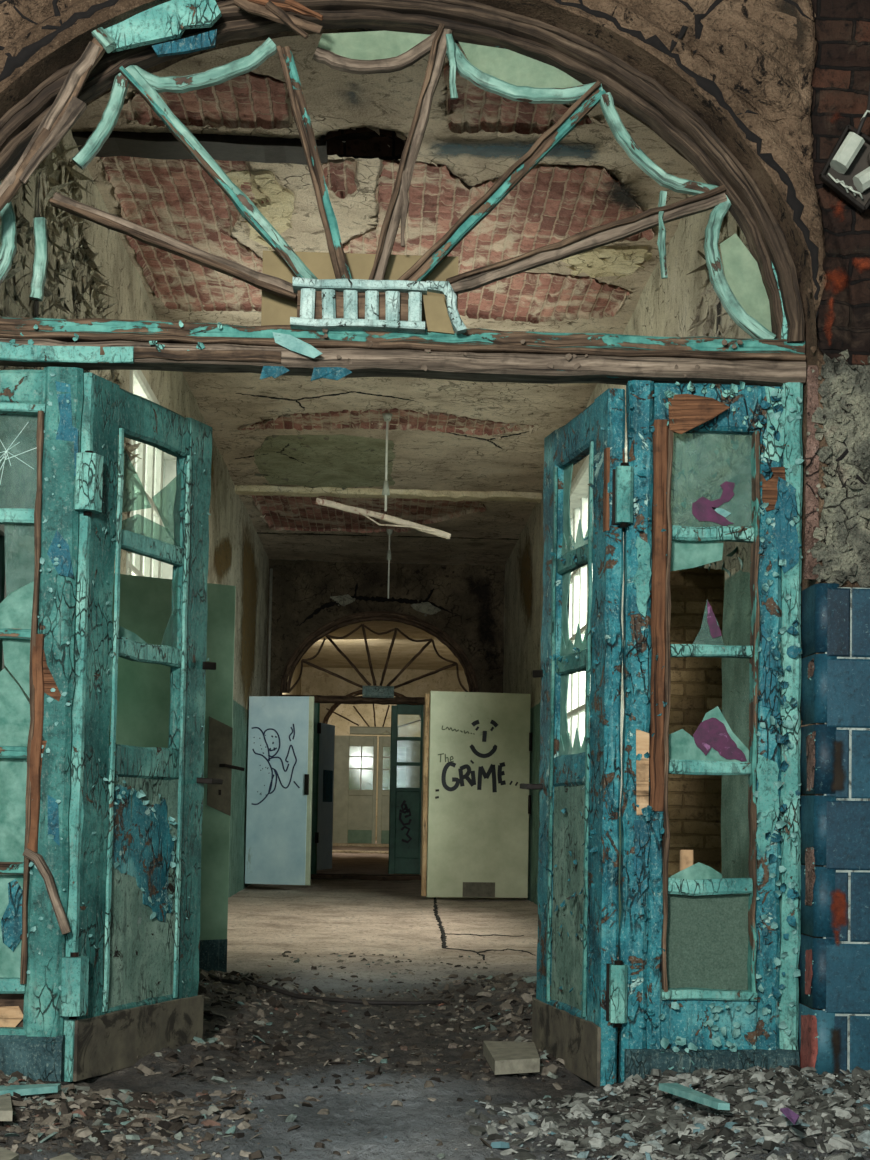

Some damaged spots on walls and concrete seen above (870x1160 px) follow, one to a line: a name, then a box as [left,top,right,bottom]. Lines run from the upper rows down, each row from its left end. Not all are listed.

crack [0,0,119,82]
flaking render [119,71,307,132]
flaking render [441,64,570,134]
crack [554,0,820,323]
peeling [0,139,119,377]
flaking render [98,156,295,329]
flaking render [458,228,654,325]
flaking render [628,0,870,595]
peeling [237,408,542,533]
crack [299,583,458,626]
peeling [703,620,841,1074]
crack [433,897,536,960]